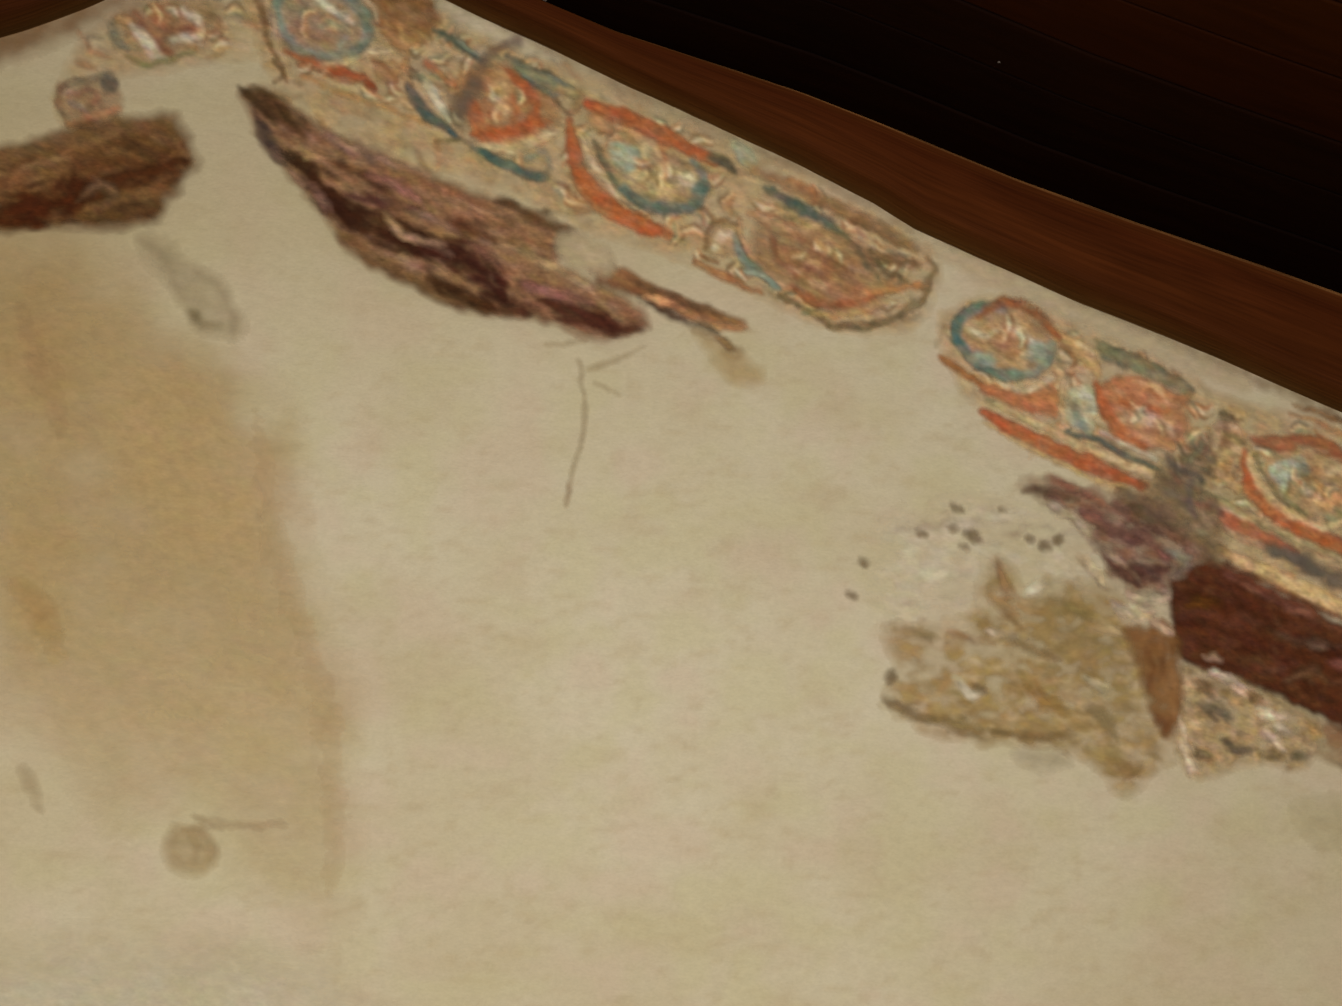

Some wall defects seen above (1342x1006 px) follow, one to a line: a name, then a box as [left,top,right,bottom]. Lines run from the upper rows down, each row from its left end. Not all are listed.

spalling [0,116,192,230]
spalling [241,88,744,350]
leakage [0,281,261,582]
spalling [1028,477,1342,772]